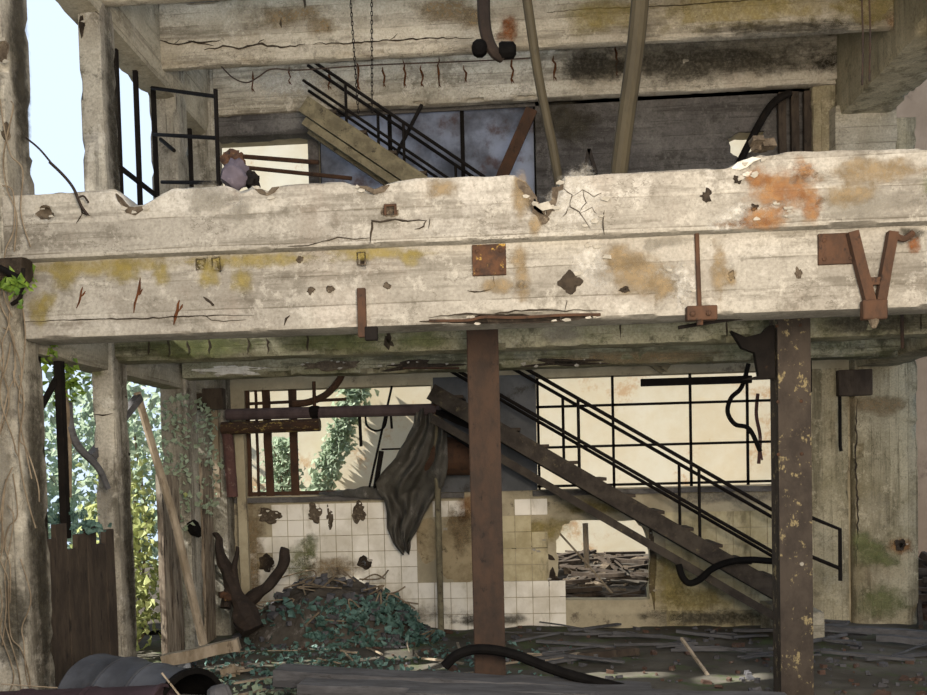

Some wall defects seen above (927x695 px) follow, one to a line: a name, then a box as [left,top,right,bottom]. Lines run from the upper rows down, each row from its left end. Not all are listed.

crack [160,19,471,90]
mould [566,52,625,80]
water stain [642,0,894,83]
spalling [516,178,611,227]
crack [563,188,605,235]
rust [729,163,821,228]
water stain [609,238,680,297]
spalling [258,508,282,524]
spalling [307,502,333,530]
spalling [352,500,367,524]
peeling [257,553,275,572]
peeling [357,555,373,571]